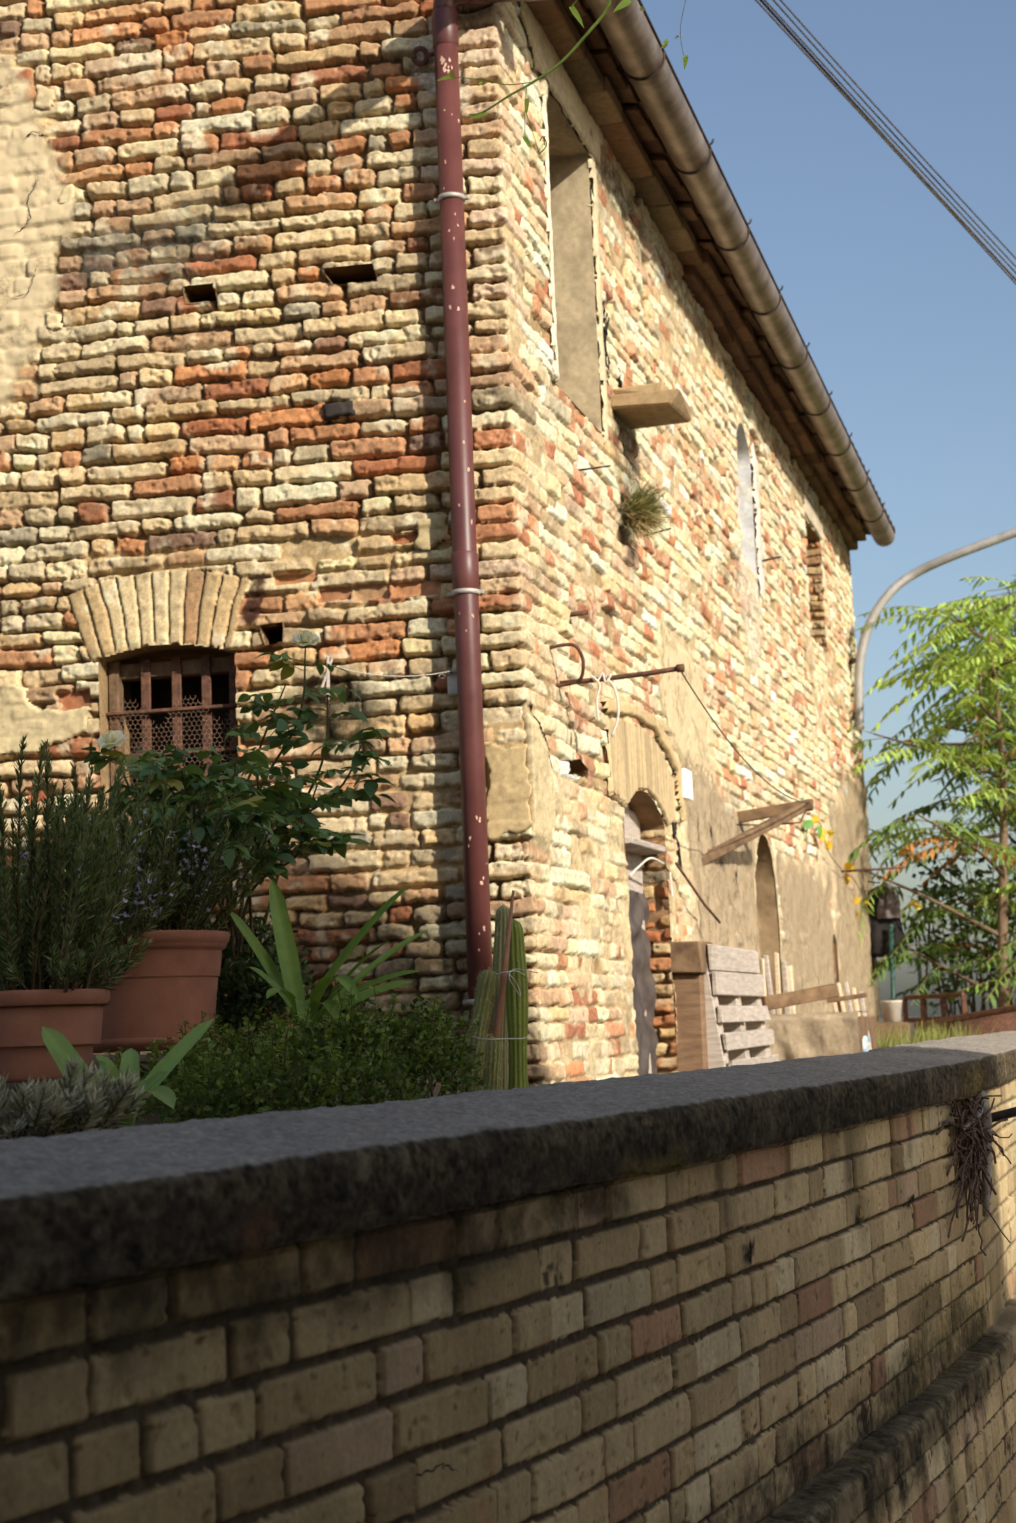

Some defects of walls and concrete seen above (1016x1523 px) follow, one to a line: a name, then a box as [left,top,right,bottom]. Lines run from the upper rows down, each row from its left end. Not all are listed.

peeling [0,63,78,404]
spalling [0,683,93,755]
spalling [27,785,53,804]